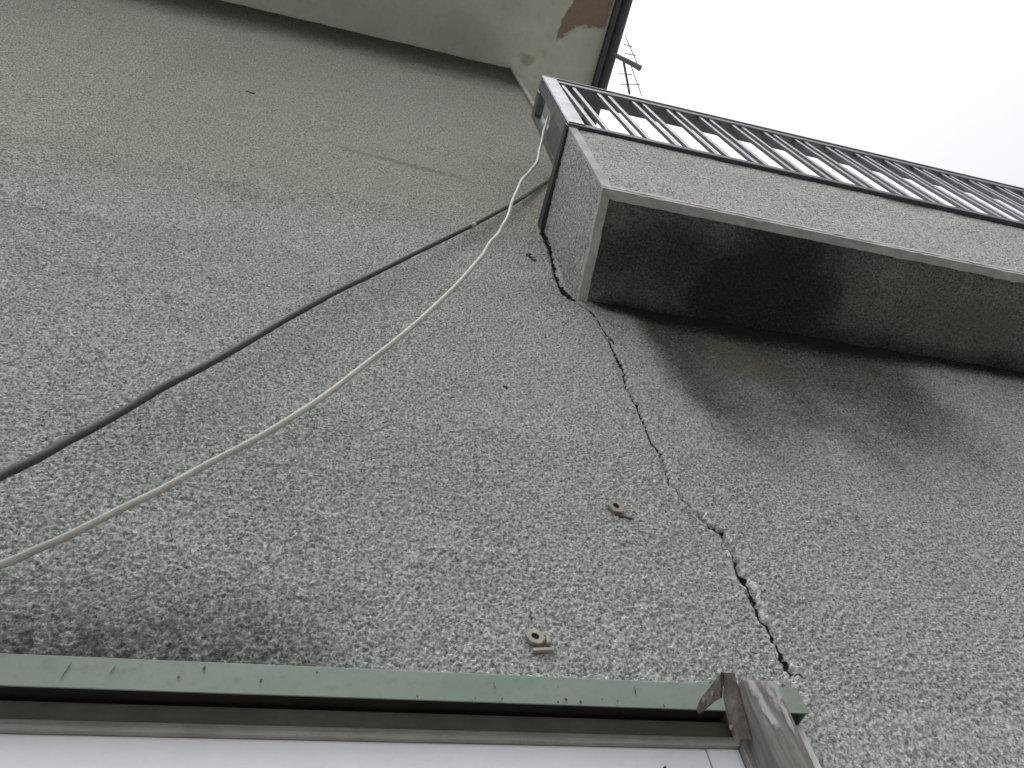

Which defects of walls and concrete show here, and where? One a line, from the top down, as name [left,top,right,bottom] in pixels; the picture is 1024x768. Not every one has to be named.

peeling [557,0,613,40]
crack [539,230,804,682]